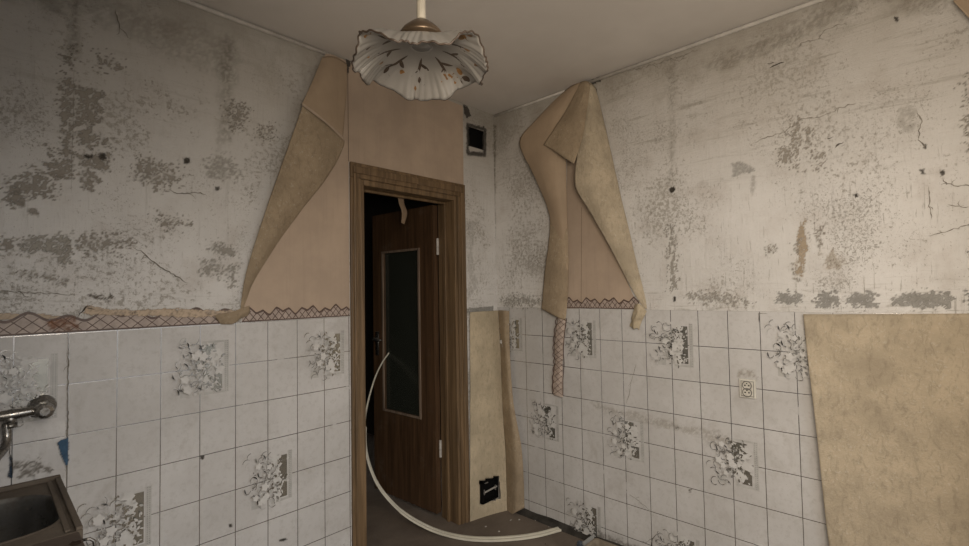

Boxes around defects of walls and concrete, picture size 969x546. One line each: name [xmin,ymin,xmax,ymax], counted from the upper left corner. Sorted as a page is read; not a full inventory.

peeling [0,45,126,214]
peeling [198,56,347,309]
peeling [501,81,647,321]
peeling [776,221,880,308]
peeling [891,290,969,309]